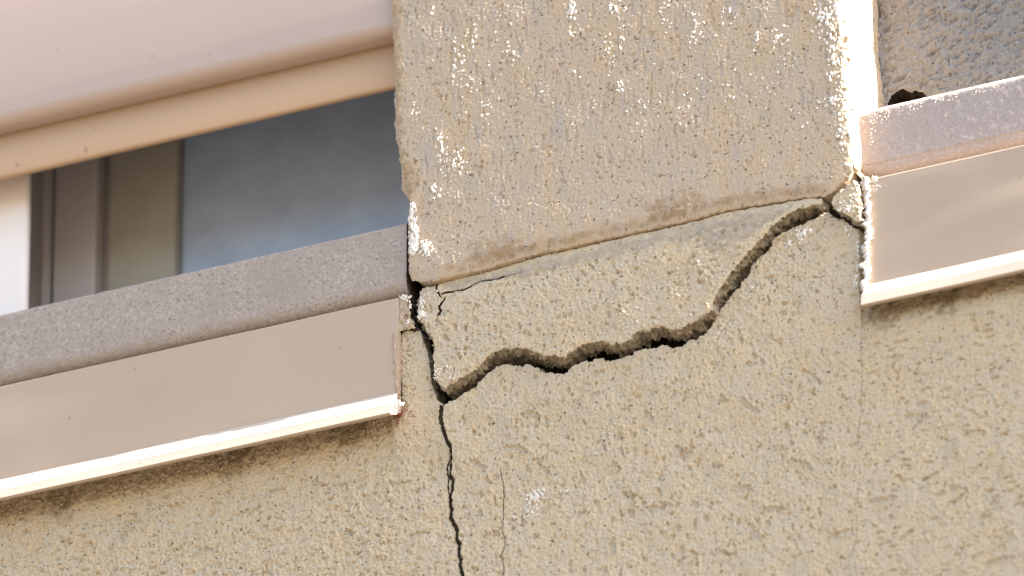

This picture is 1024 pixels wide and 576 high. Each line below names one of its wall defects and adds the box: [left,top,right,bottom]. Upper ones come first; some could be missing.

crack [804,206,859,229]
crack [423,271,522,344]
crack [533,337,693,374]
crack [438,392,464,576]
crack [499,470,507,576]